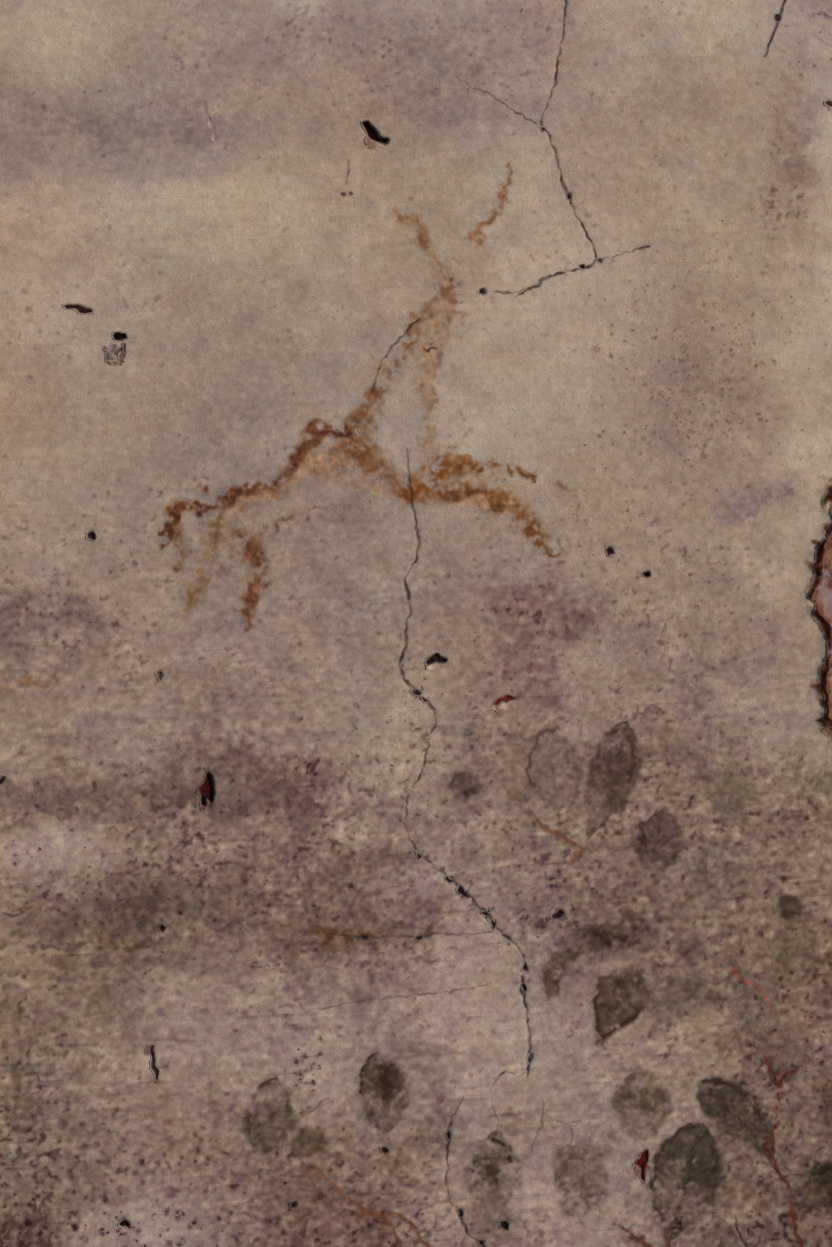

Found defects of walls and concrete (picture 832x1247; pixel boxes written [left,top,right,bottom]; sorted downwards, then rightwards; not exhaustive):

rust [465,160,516,250]
crack [455,0,651,298]
rust [153,199,582,635]
crack [371,317,421,394]
peeling [803,474,832,743]
crack [310,448,607,1247]
water stain [0,978,434,1247]